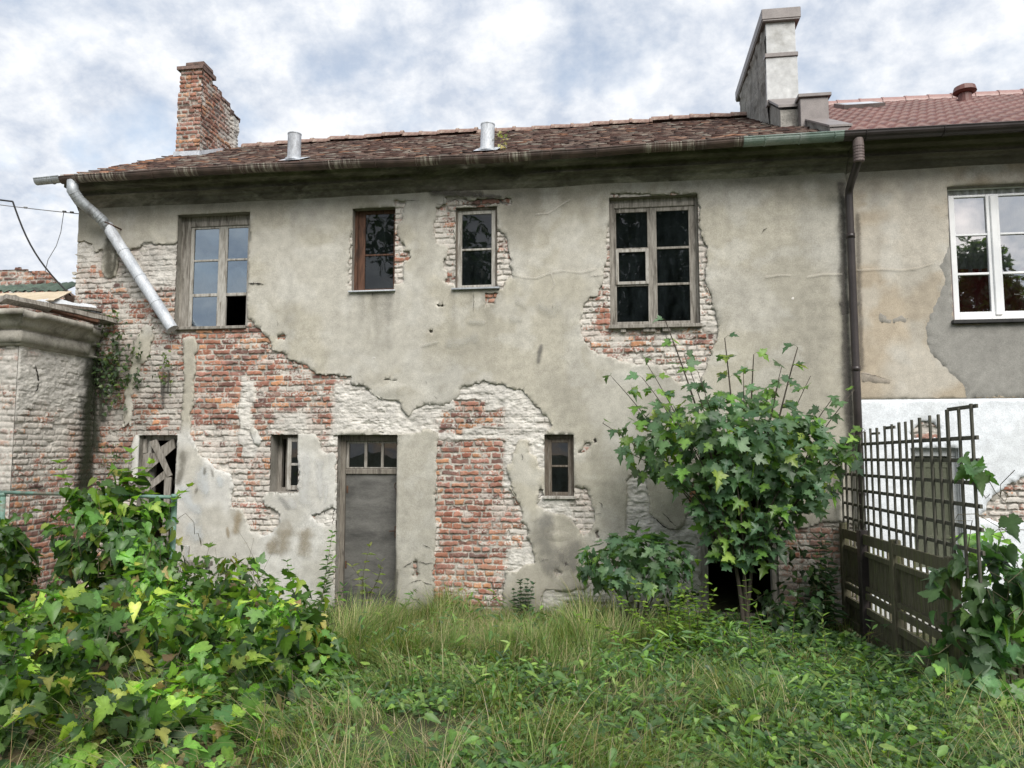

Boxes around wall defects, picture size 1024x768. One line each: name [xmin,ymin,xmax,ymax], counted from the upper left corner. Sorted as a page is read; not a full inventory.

spalling [394,200,411,284]
spalling [434,196,512,285]
spalling [580,192,718,384]
damp [838,182,864,451]
spalling [72,230,552,615]
spalling [979,477,1024,523]